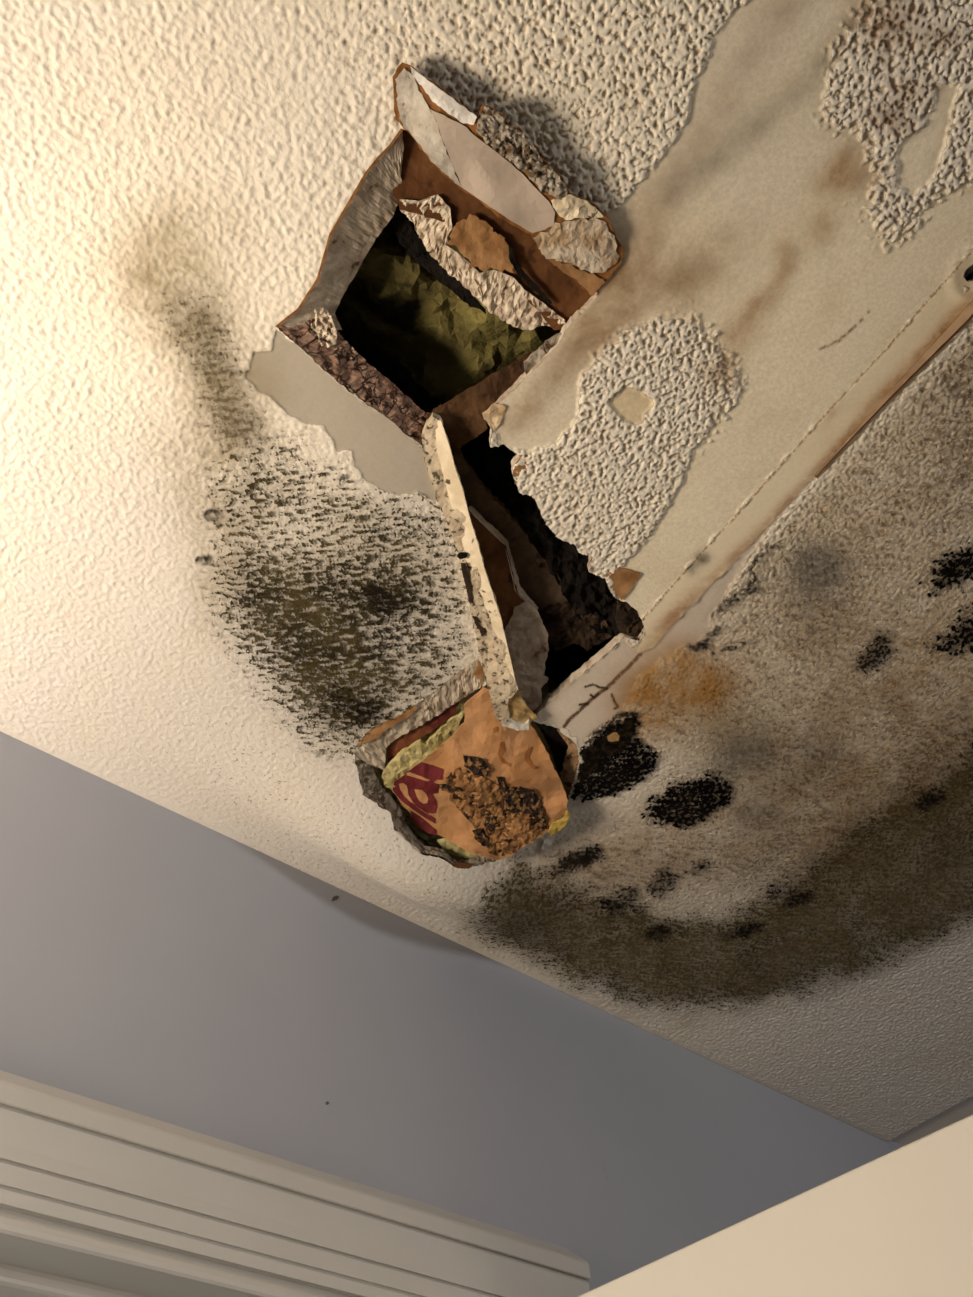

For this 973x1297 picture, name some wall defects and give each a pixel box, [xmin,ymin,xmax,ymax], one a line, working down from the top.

damp [141,267,470,760]
peeling [246,330,437,501]
peeling [400,0,973,620]
peeling [539,438,857,748]
damp [445,338,973,1013]